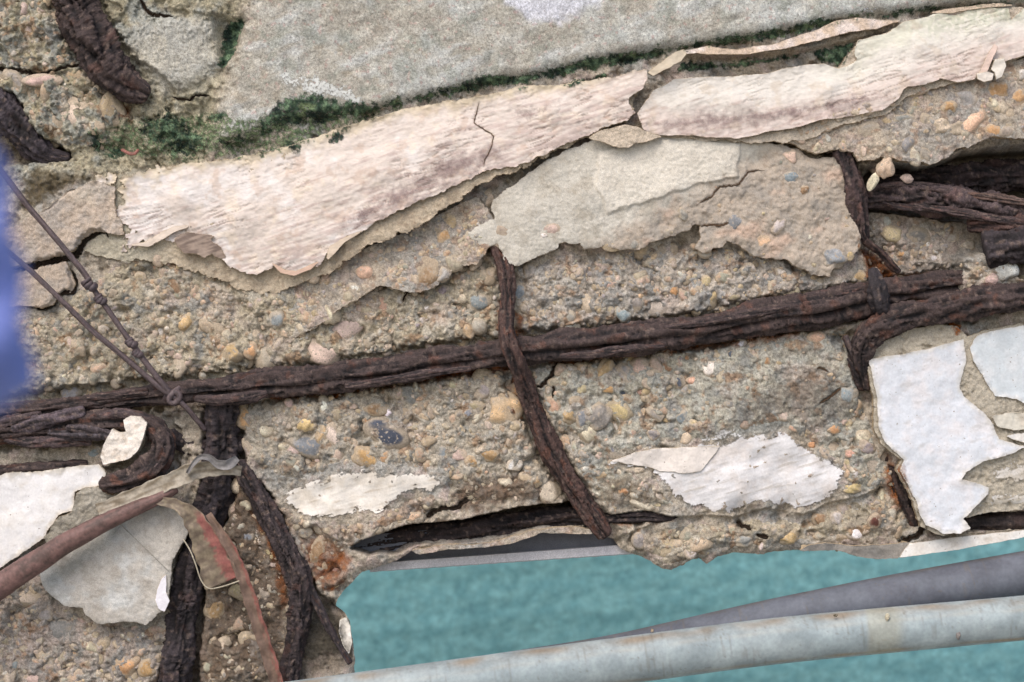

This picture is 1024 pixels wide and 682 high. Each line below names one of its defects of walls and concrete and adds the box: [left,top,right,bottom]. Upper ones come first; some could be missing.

crack [474,103,494,162]
peeling [38,3,1024,565]
rust [861,248,897,278]
rust [664,333,797,353]
spalling [0,217,198,568]
rust [375,366,514,392]
peeling [278,469,592,592]
crack [427,497,475,518]
peeling [0,506,189,682]
rust [308,543,349,590]